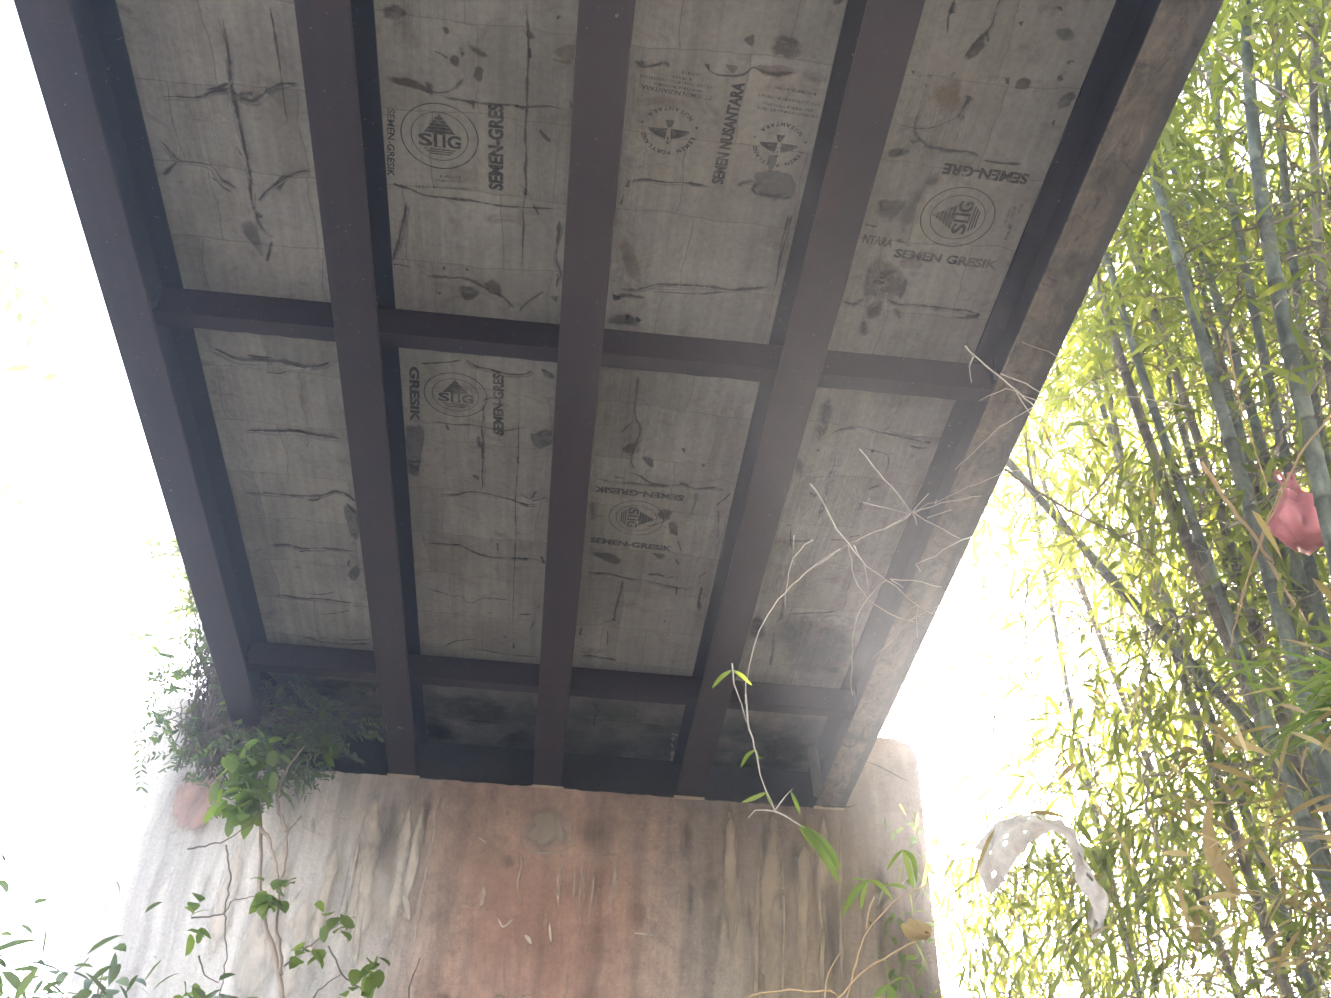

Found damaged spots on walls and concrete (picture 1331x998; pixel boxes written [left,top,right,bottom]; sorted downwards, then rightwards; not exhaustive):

water stain [207,841,242,952]
water stain [234,800,382,998]
water stain [387,804,440,928]
water stain [724,812,737,940]
water stain [753,815,844,998]